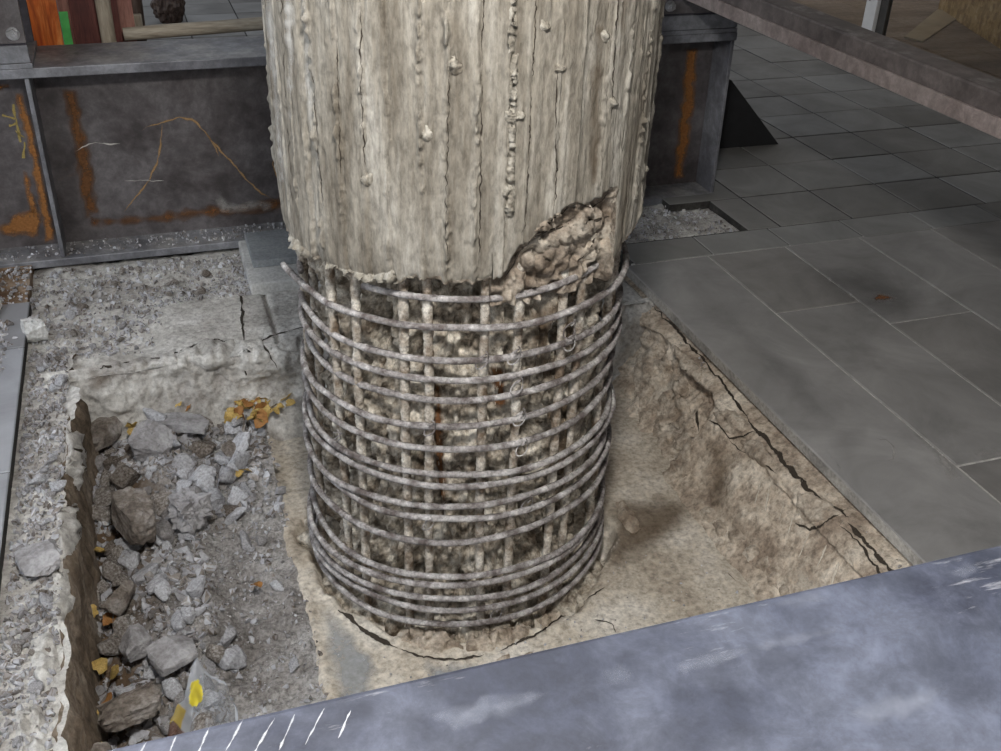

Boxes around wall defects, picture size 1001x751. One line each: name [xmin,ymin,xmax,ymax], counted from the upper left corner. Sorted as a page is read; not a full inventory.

corrosion [1,96,54,239]
corrosion [65,91,280,225]
spalling [288,234,422,284]
spalling [516,206,614,275]
crack [652,306,893,574]
spalling [366,611,387,625]
spalling [400,610,560,653]